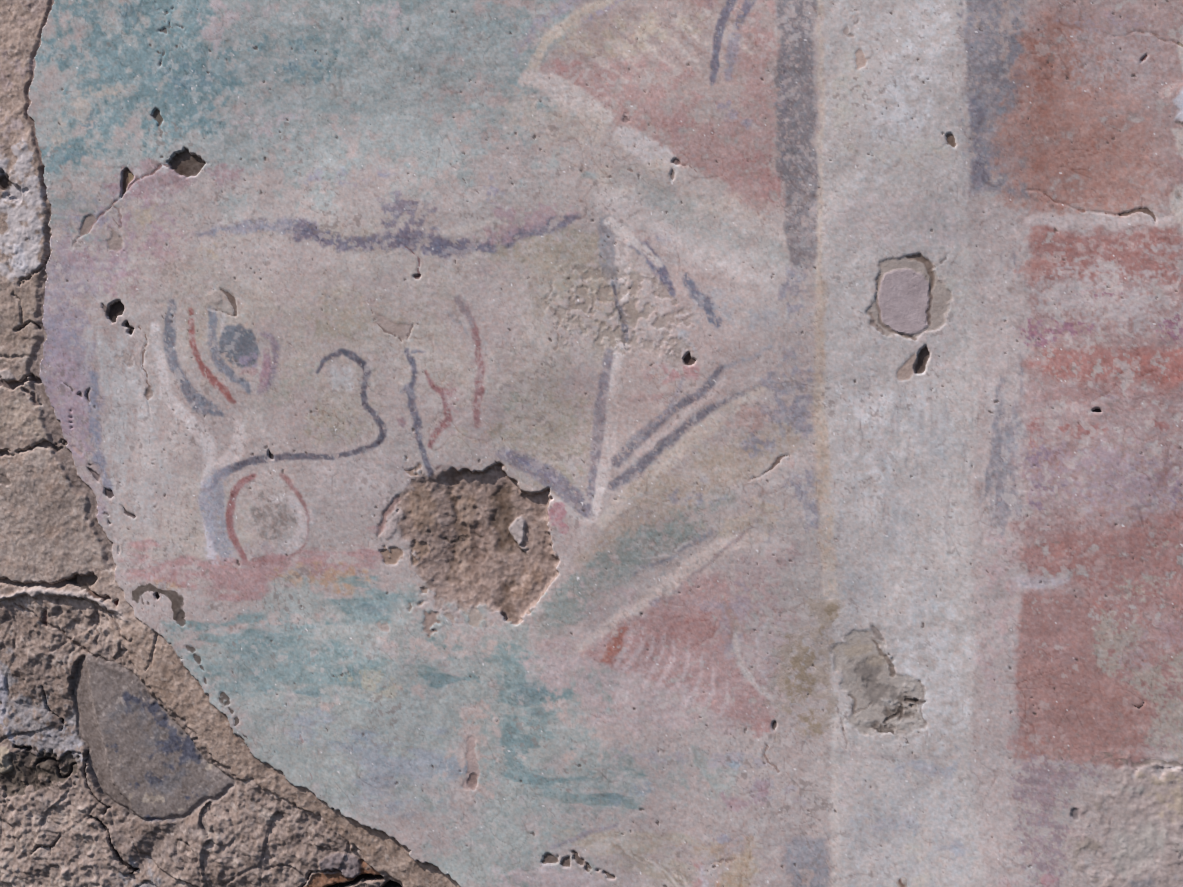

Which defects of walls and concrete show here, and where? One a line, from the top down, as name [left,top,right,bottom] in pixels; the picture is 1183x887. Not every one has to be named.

spalling [877,255,953,381]
spalling [0,0,460,887]
spalling [377,457,560,638]
crack [0,572,158,670]
peeling [831,626,928,749]
crack [31,835,61,856]
crack [83,758,139,874]
crack [301,869,402,887]
peeling [462,736,480,790]